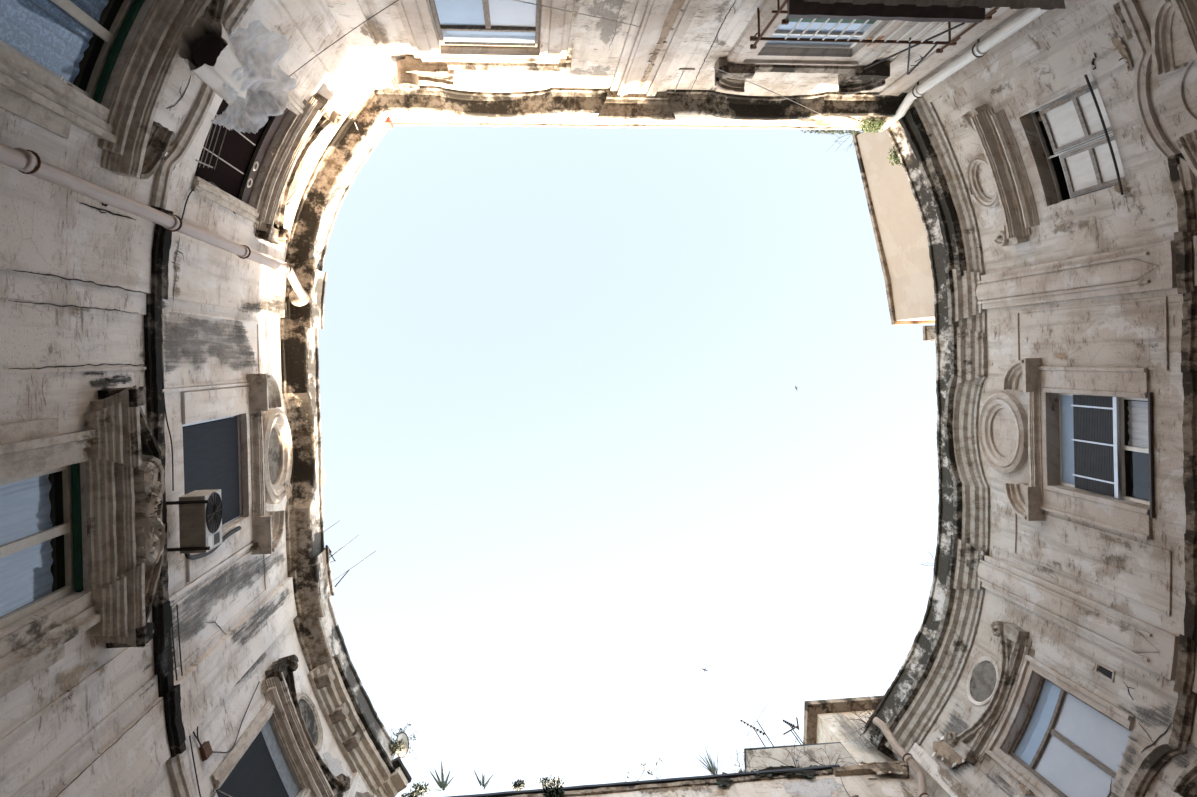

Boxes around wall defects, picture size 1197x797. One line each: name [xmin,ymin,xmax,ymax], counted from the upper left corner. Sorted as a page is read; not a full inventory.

leakage [164,300,287,371]
leakage [145,555,285,676]